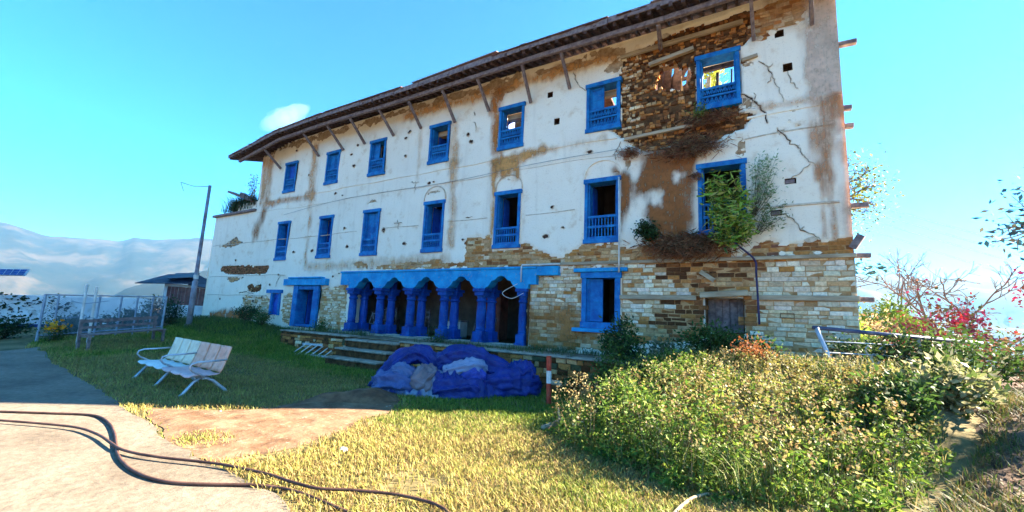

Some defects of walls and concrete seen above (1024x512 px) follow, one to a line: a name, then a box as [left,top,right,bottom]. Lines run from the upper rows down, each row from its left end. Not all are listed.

damp [254,145,318,238]
peeling [265,71,523,157]
damp [405,55,617,244]
spalling [535,0,809,173]
crack [741,61,816,178]
damp [810,94,848,182]
spalling [219,237,293,325]
spalling [354,234,861,363]